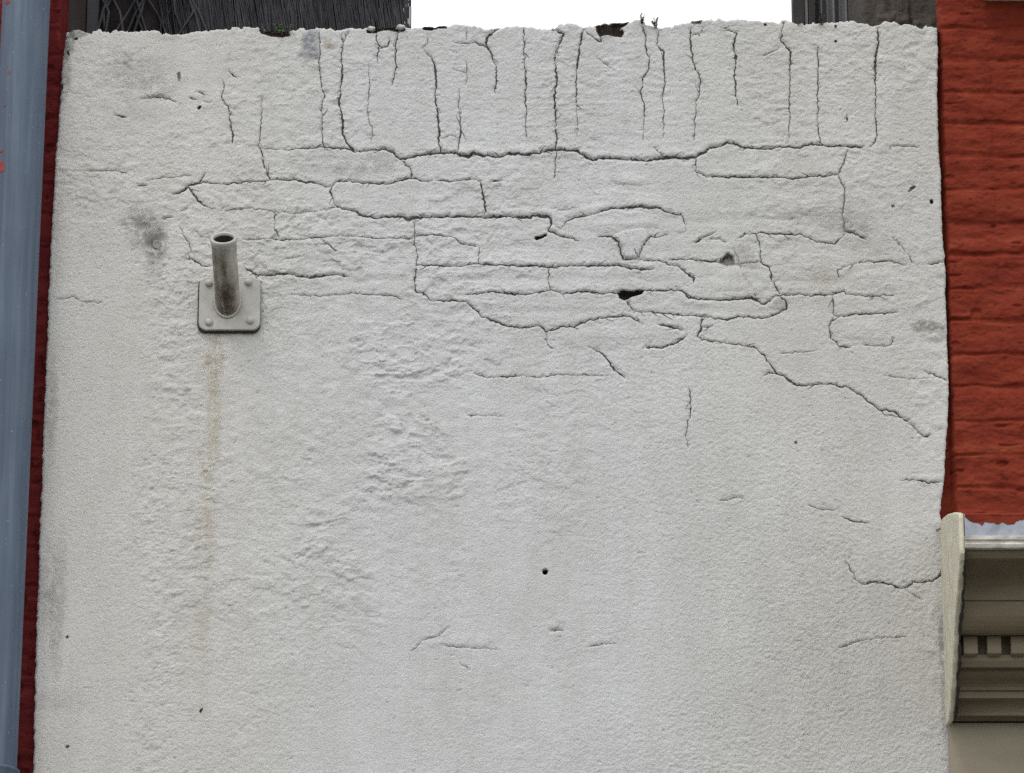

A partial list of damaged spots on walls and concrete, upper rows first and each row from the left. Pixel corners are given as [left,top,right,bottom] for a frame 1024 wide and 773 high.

spalling [595,22,629,37]
crack [105,24,939,437]
crack [845,559,941,599]